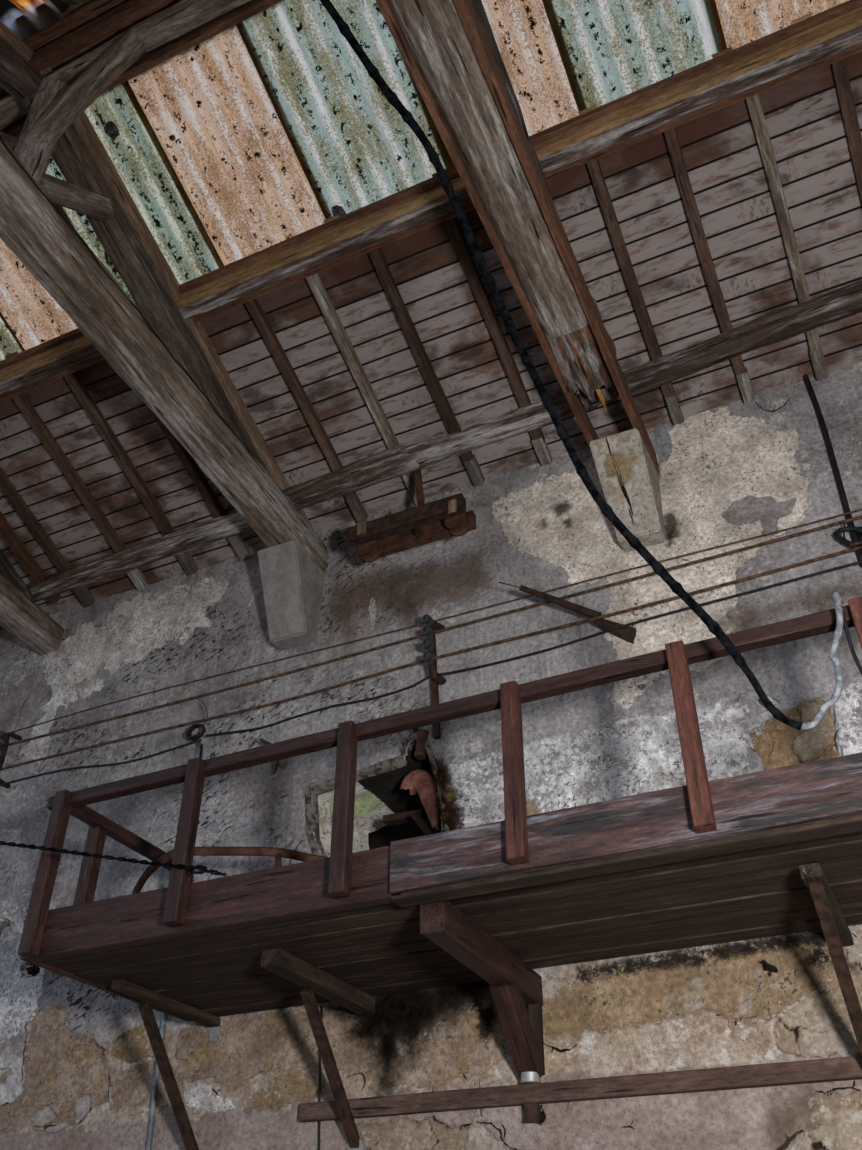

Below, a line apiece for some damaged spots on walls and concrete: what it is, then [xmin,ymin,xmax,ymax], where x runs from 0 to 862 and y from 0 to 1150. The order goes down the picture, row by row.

crack [605,437,633,525]
peeling [491,406,811,660]
peeling [20,576,229,763]
peeling [689,657,723,672]
peeling [523,669,687,813]
spalling [696,675,862,781]
flaking render [0,896,511,1134]
water stain [357,1016,420,1090]
water stain [477,1007,495,1039]
flaking render [542,931,862,1058]
spalling [356,1116,514,1150]
spalling [790,1090,862,1150]